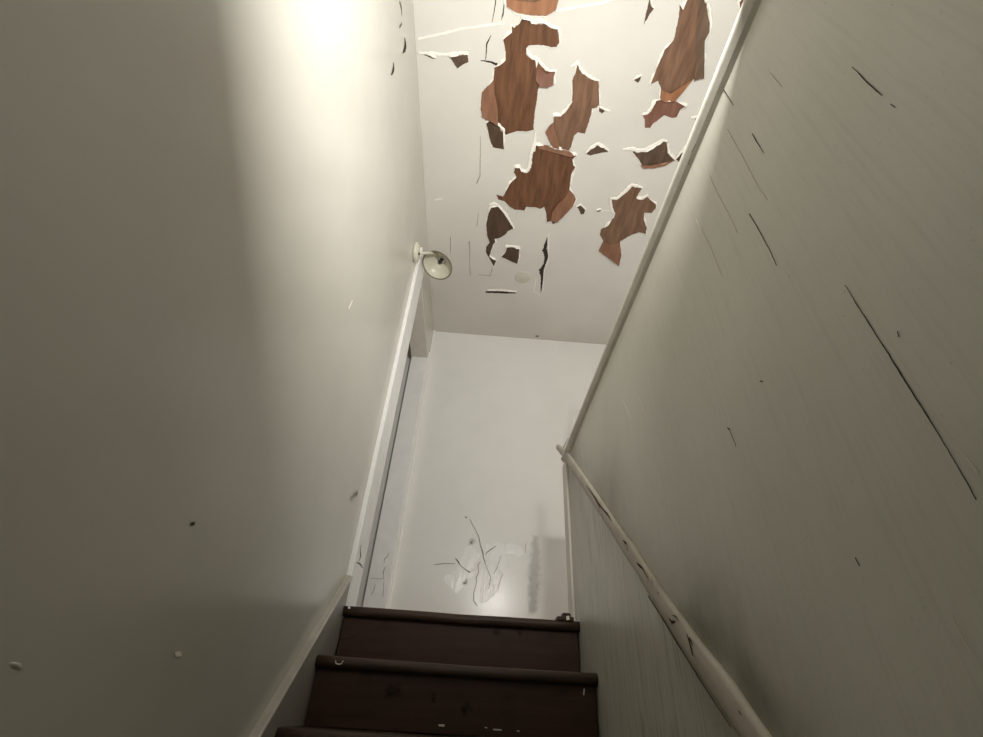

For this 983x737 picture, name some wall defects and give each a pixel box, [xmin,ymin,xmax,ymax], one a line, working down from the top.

peeling [418,51,469,68]
crack [481,0,504,66]
peeling [633,0,713,128]
peeling [479,0,657,266]
peeling [623,139,696,169]
crack [845,285,977,500]
crack [434,517,503,606]